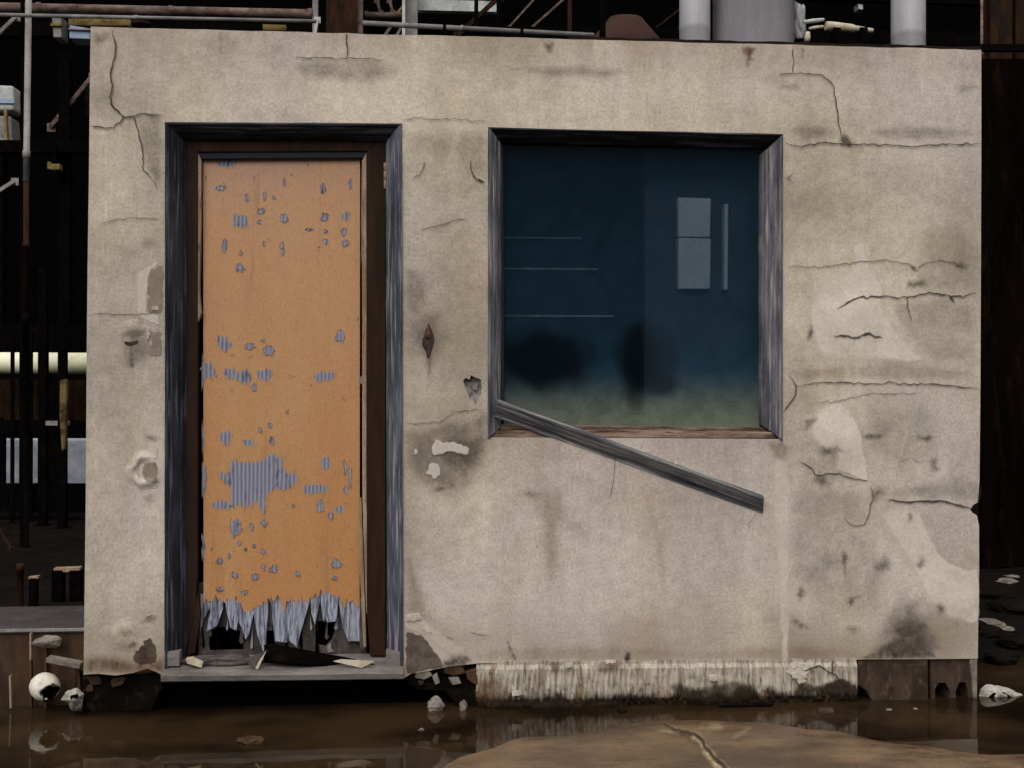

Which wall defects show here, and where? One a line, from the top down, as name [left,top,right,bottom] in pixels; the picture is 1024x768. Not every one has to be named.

crack [91,30,164,188]
crack [780,50,981,147]
spalling [147,265,163,313]
crack [792,259,977,319]
crack [835,331,883,339]
spalling [463,376,482,405]
crack [784,376,978,411]
spalling [143,462,157,483]
crack [800,462,971,527]
spalling [133,638,157,665]
spalling [405,613,467,673]
damp [880,614,931,657]